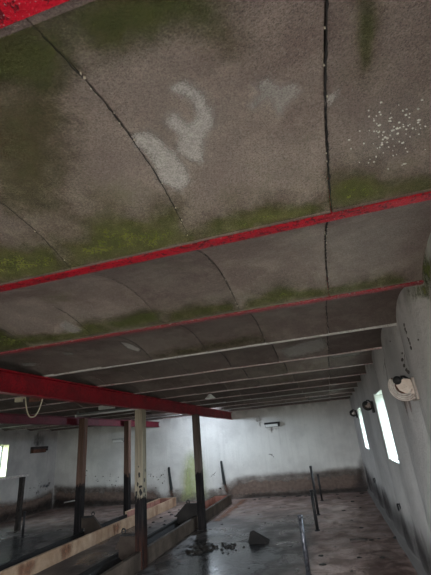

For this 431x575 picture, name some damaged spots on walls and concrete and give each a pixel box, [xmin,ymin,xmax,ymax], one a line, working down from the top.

crack [32,27,288,373]
water stain [132,81,213,191]
crack [323,0,332,368]
water stain [209,471,388,508]